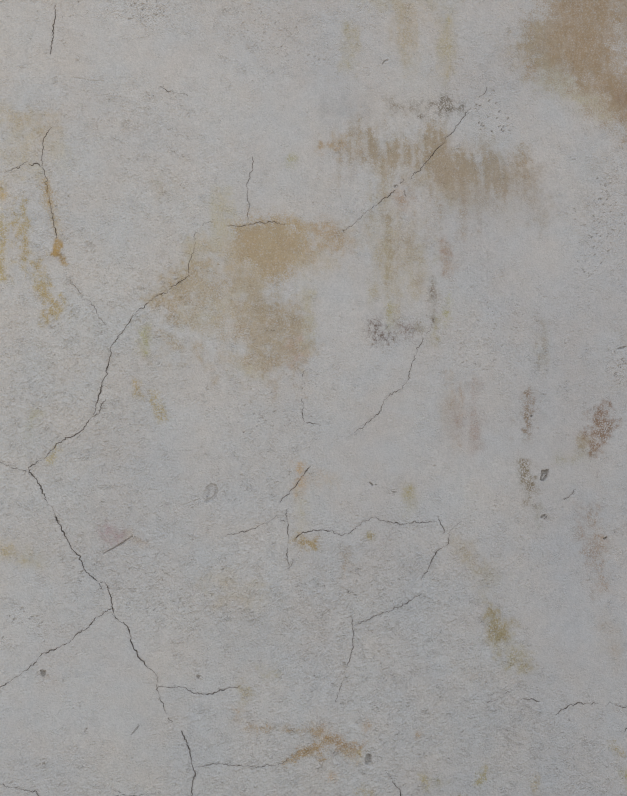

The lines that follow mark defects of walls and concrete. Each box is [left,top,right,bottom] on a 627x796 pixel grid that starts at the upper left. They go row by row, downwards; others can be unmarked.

damp [499,0,627,149]
crack [5,127,58,238]
crack [229,152,285,228]
damp [135,0,561,397]
crack [344,88,488,232]
crack [0,221,292,796]
crack [227,466,462,702]